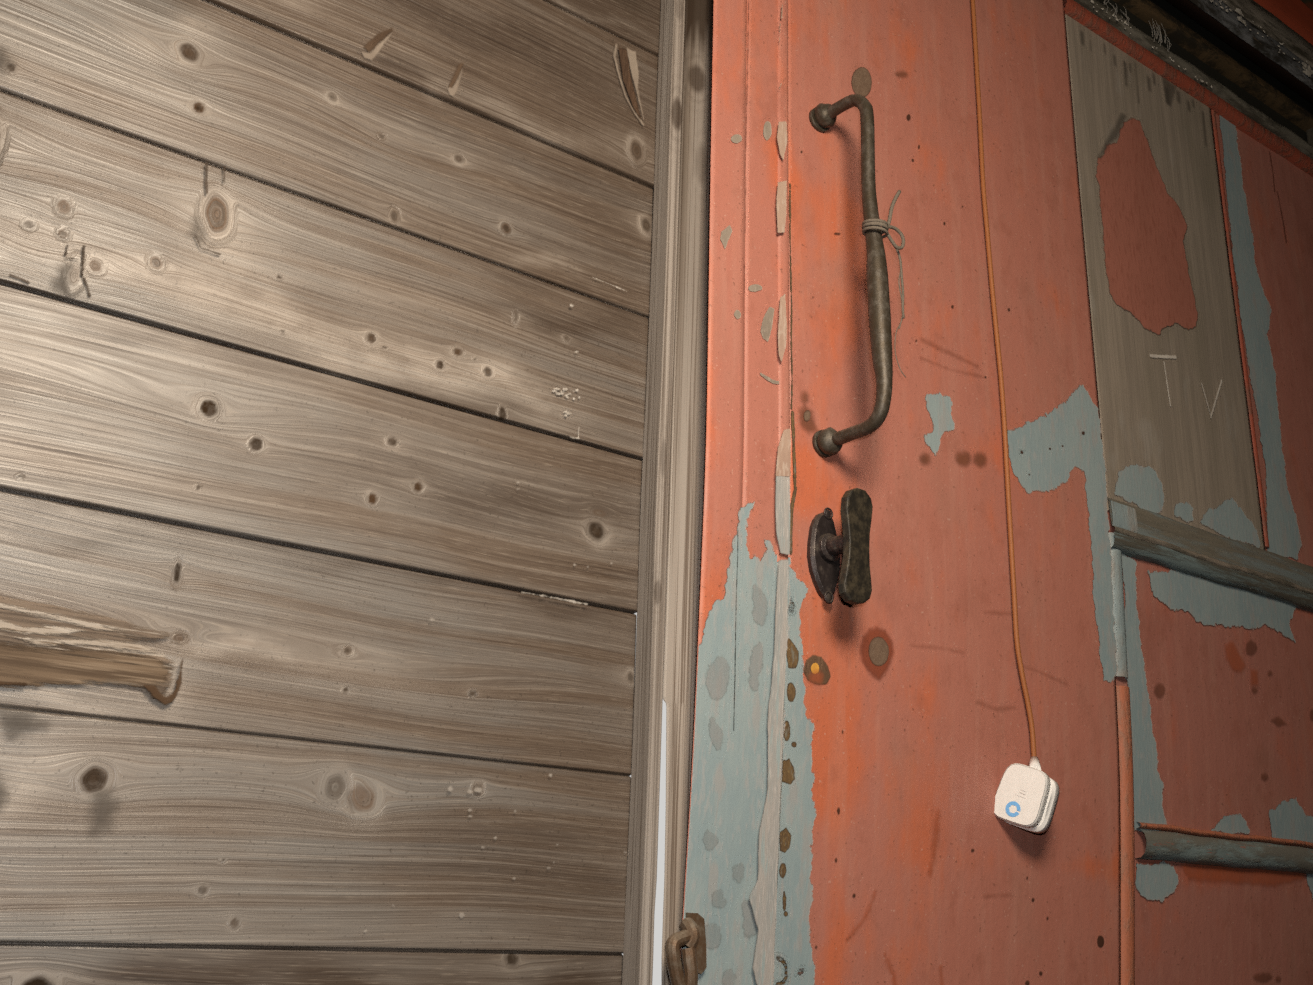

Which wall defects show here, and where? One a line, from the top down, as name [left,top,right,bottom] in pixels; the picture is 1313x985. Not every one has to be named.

peeling [776,181,787,233]
peeling [760,294,787,361]
peeling [924,392,955,455]
peeling [1007,115,1302,834]
peeling [684,429,817,985]
peeling [1269,797,1313,843]
peeling [1135,860,1179,902]